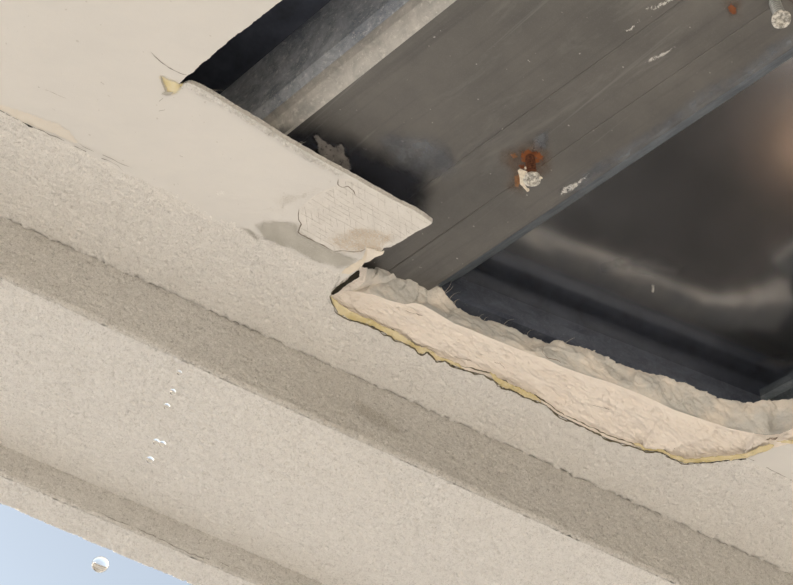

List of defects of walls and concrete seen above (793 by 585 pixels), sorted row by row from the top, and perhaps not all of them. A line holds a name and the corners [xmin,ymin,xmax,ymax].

spalling [298,179,793,465]